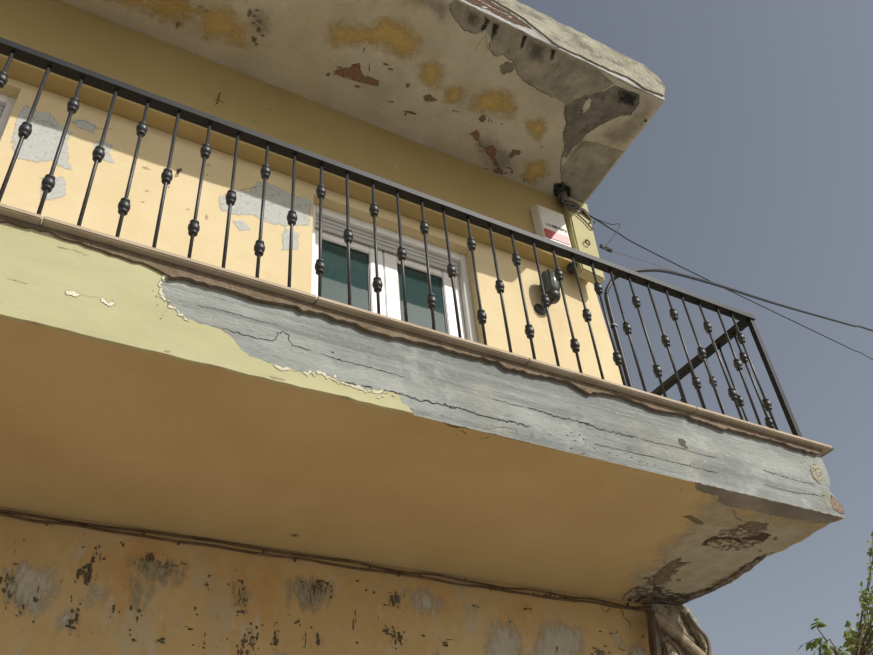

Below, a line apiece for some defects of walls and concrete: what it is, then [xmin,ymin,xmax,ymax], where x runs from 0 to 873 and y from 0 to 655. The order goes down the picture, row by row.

peeling [326,63,379,88]
water stain [330,19,418,57]
flaking render [449,0,640,181]
peeling [10,105,104,200]
peeling [94,141,115,163]
peeling [219,182,311,250]
crack [196,304,717,473]
spalling [153,274,844,627]